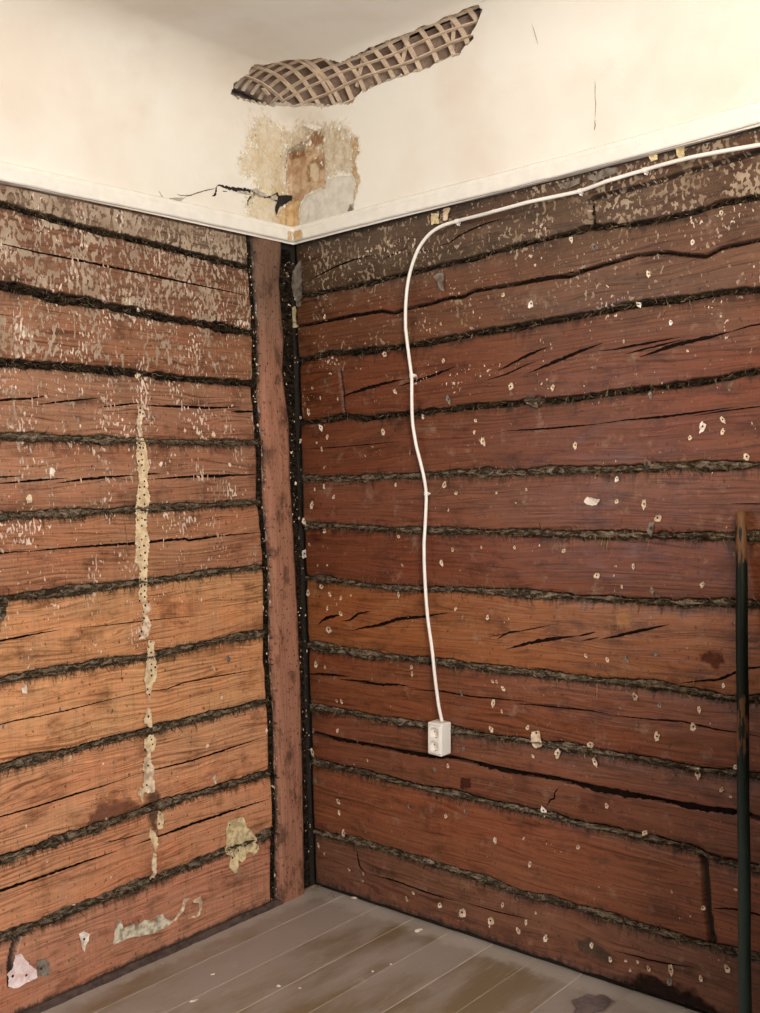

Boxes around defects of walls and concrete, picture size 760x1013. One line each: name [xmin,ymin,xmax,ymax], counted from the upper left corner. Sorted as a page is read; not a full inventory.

spalling [231,5,482,170]
crack [160,142,301,215]
crack [2,244,248,296]
peeling [0,186,252,507]
crack [485,323,760,381]
crack [343,366,456,397]
crack [318,611,445,631]
crack [490,624,669,649]
crack [315,731,760,817]
peeling [113,896,202,945]
damp [572,994,613,1013]